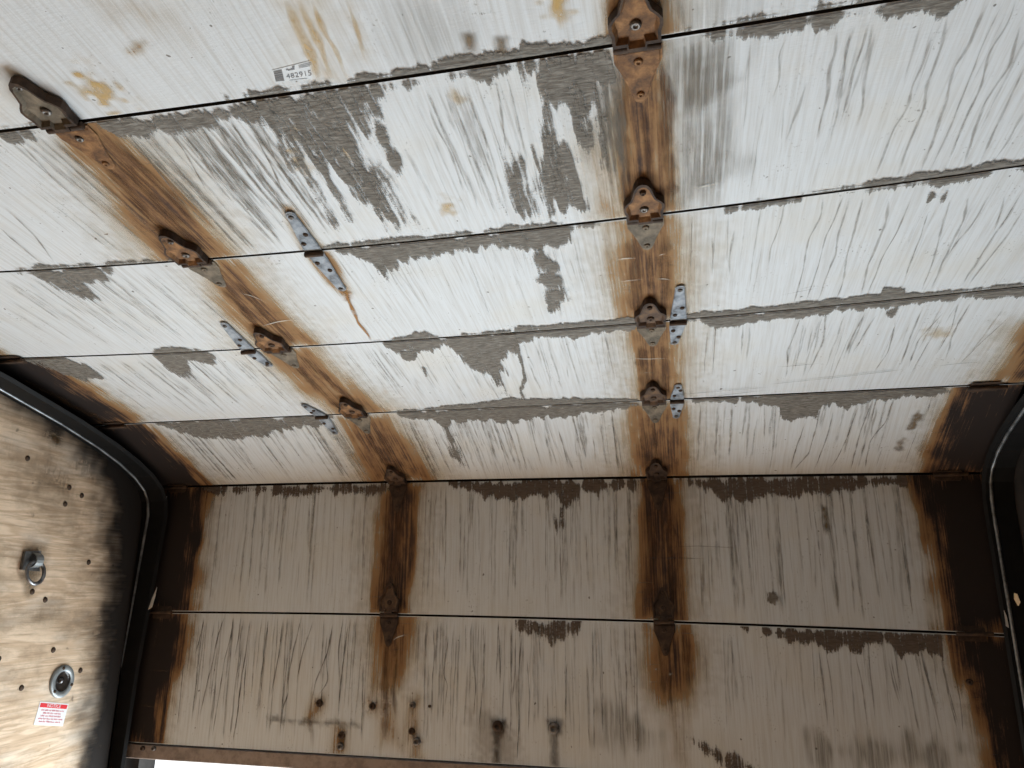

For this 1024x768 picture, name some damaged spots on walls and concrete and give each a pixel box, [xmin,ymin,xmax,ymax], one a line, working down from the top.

corrosion [62,121,435,740]
corrosion [600,0,698,707]
corrosion [906,323,1024,768]